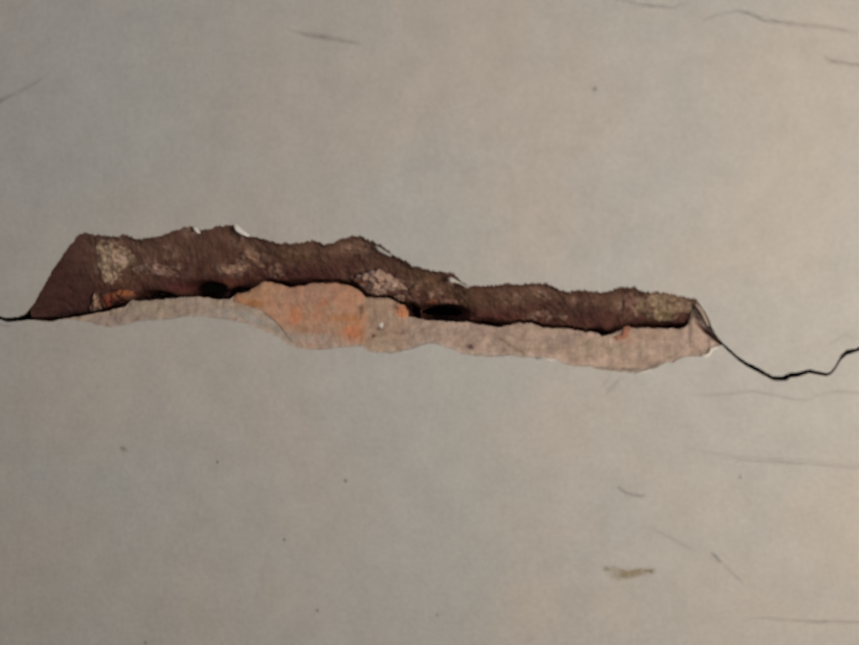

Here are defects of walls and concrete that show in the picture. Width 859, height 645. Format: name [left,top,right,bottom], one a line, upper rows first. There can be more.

crack [0,310,34,322]
spalling [29,224,720,373]
crack [719,340,859,381]